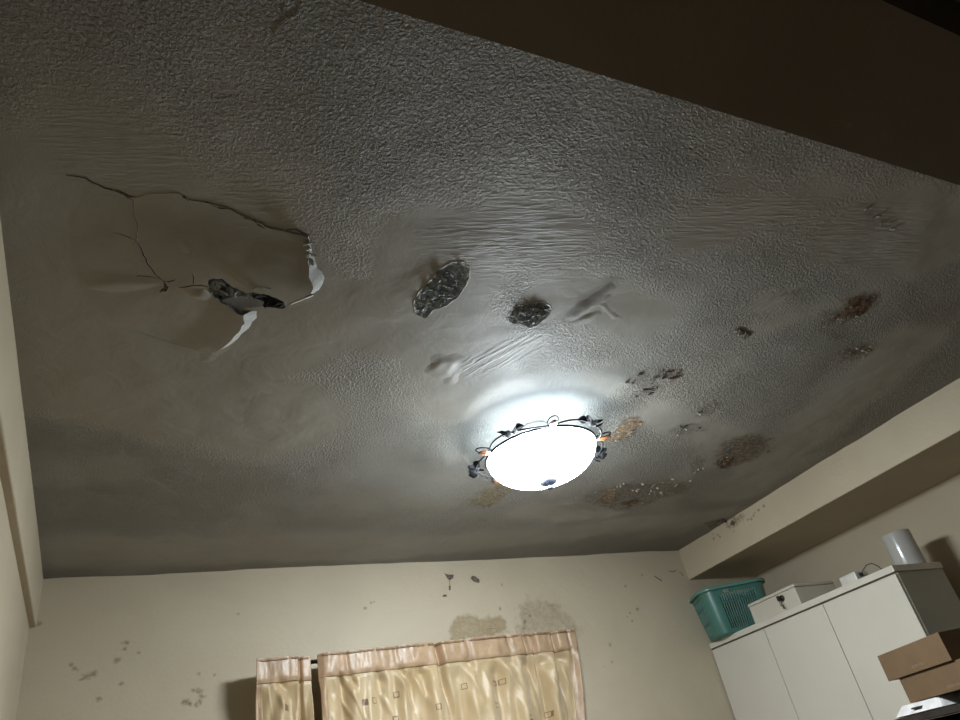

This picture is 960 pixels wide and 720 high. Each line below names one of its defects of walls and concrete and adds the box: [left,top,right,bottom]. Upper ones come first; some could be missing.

crack [178,192,309,236]
crack [66,175,208,292]
spalling [207,279,286,315]
spalling [412,261,471,319]
spalling [506,301,553,329]
peeling [625,370,681,398]
damp [451,616,506,640]